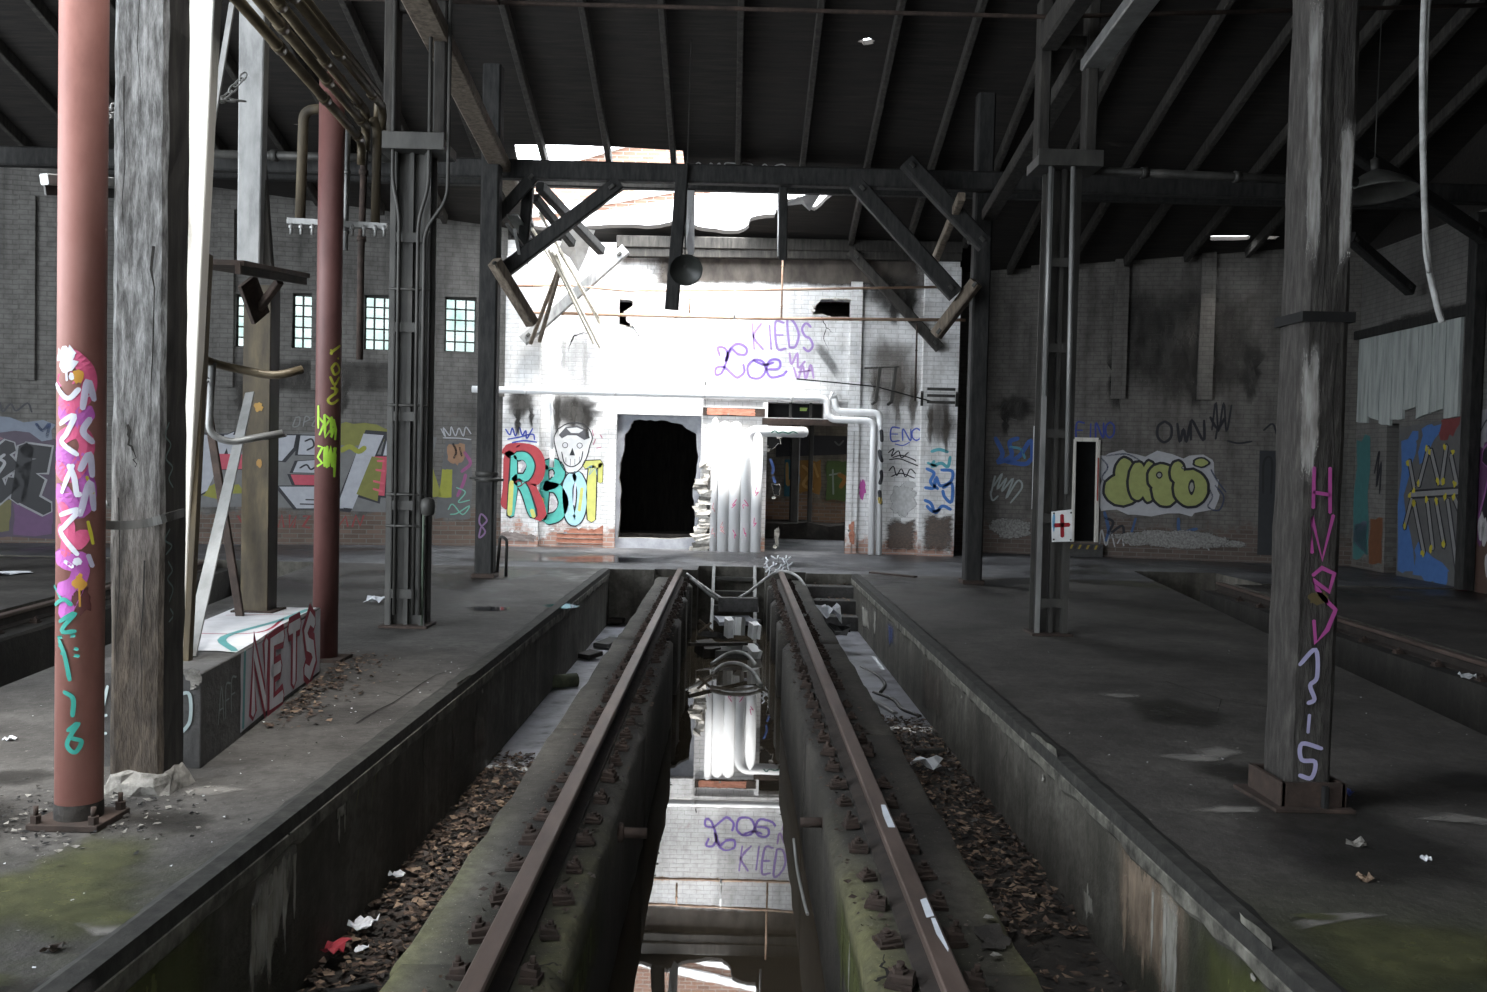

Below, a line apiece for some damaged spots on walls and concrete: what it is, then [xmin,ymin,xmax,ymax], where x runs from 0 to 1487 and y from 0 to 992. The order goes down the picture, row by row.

water stain [889,291,917,322]
water stain [250,854,297,992]
water stain [1151,893,1177,992]